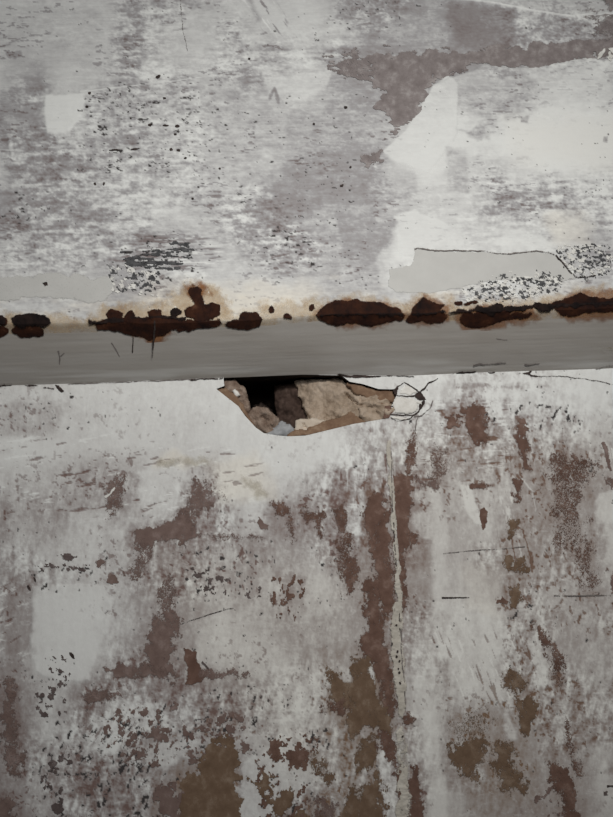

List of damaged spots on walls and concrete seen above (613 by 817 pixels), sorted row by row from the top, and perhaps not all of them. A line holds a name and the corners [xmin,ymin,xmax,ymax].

flaking render [388,239,613,306]
corrosion [0,282,613,343]
spalling [217,375,397,436]
crack [338,362,613,436]